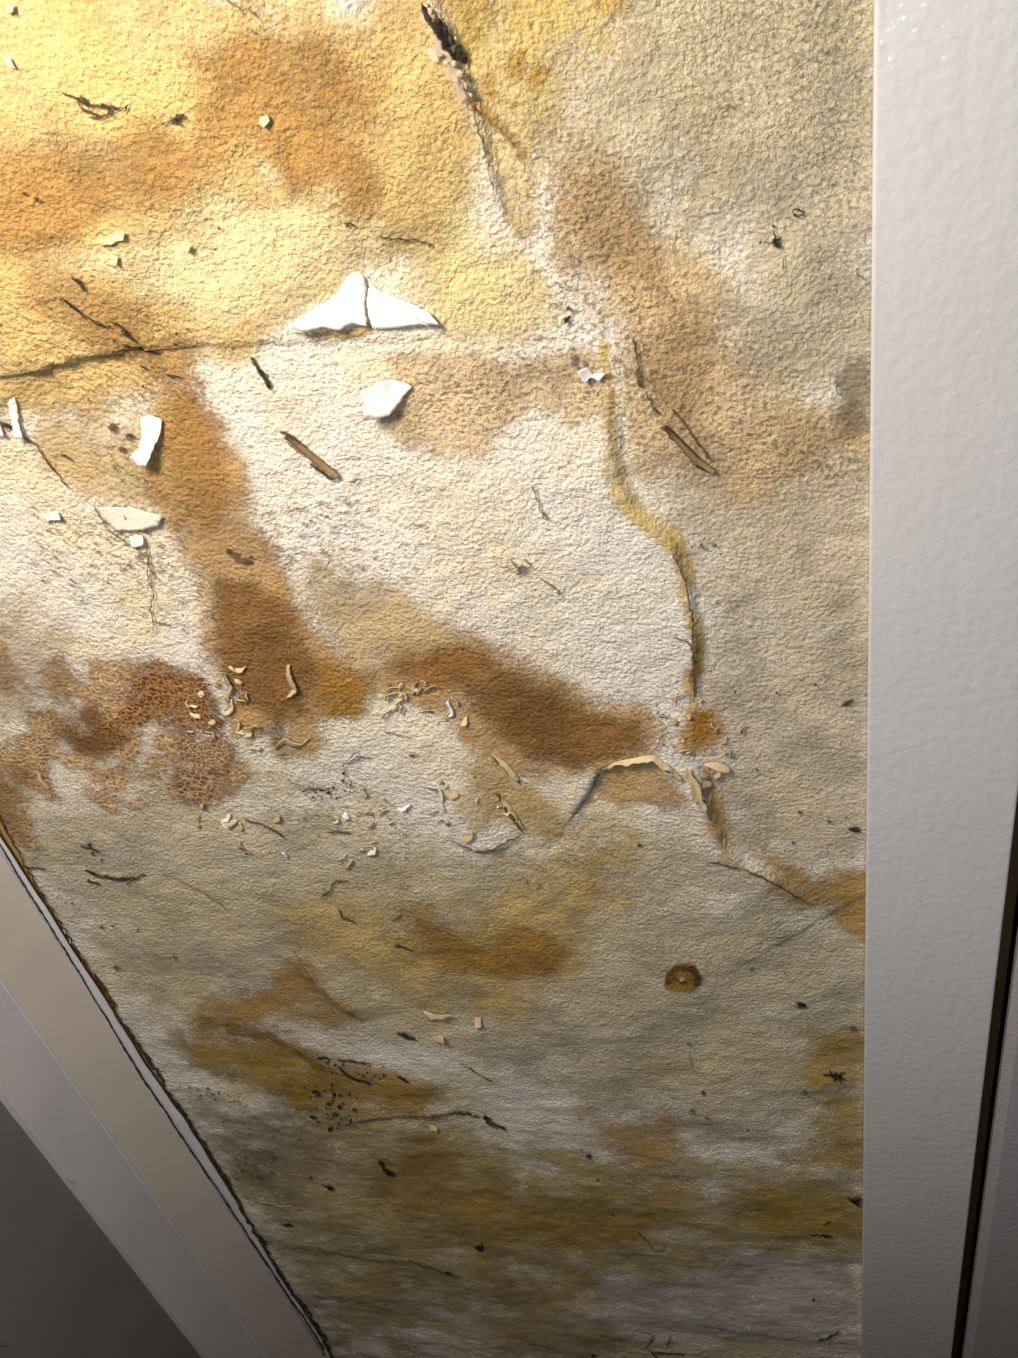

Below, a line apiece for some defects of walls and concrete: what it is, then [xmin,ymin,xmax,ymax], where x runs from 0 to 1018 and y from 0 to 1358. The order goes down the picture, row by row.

peeling [287,272,441,335]
peeling [359,379,412,419]
water stain [0,0,873,863]
crack [633,338,712,461]
peeling [0,300,312,751]
crack [669,548,698,699]
crack [456,758,620,854]
water stain [0,655,865,1348]
corrosion [664,963,701,993]
water stain [636,1330,685,1358]